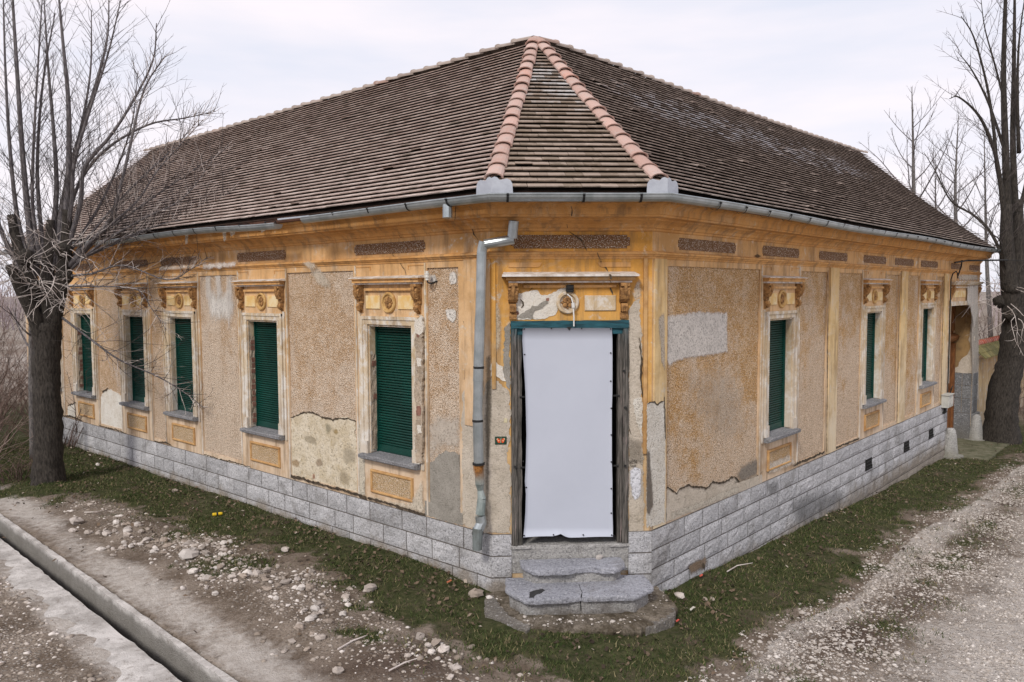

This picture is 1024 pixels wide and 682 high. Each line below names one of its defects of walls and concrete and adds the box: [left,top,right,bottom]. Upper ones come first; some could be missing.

peeling [290,354,423,512]
flaking render [461,288,566,528]
peeling [633,397,795,528]